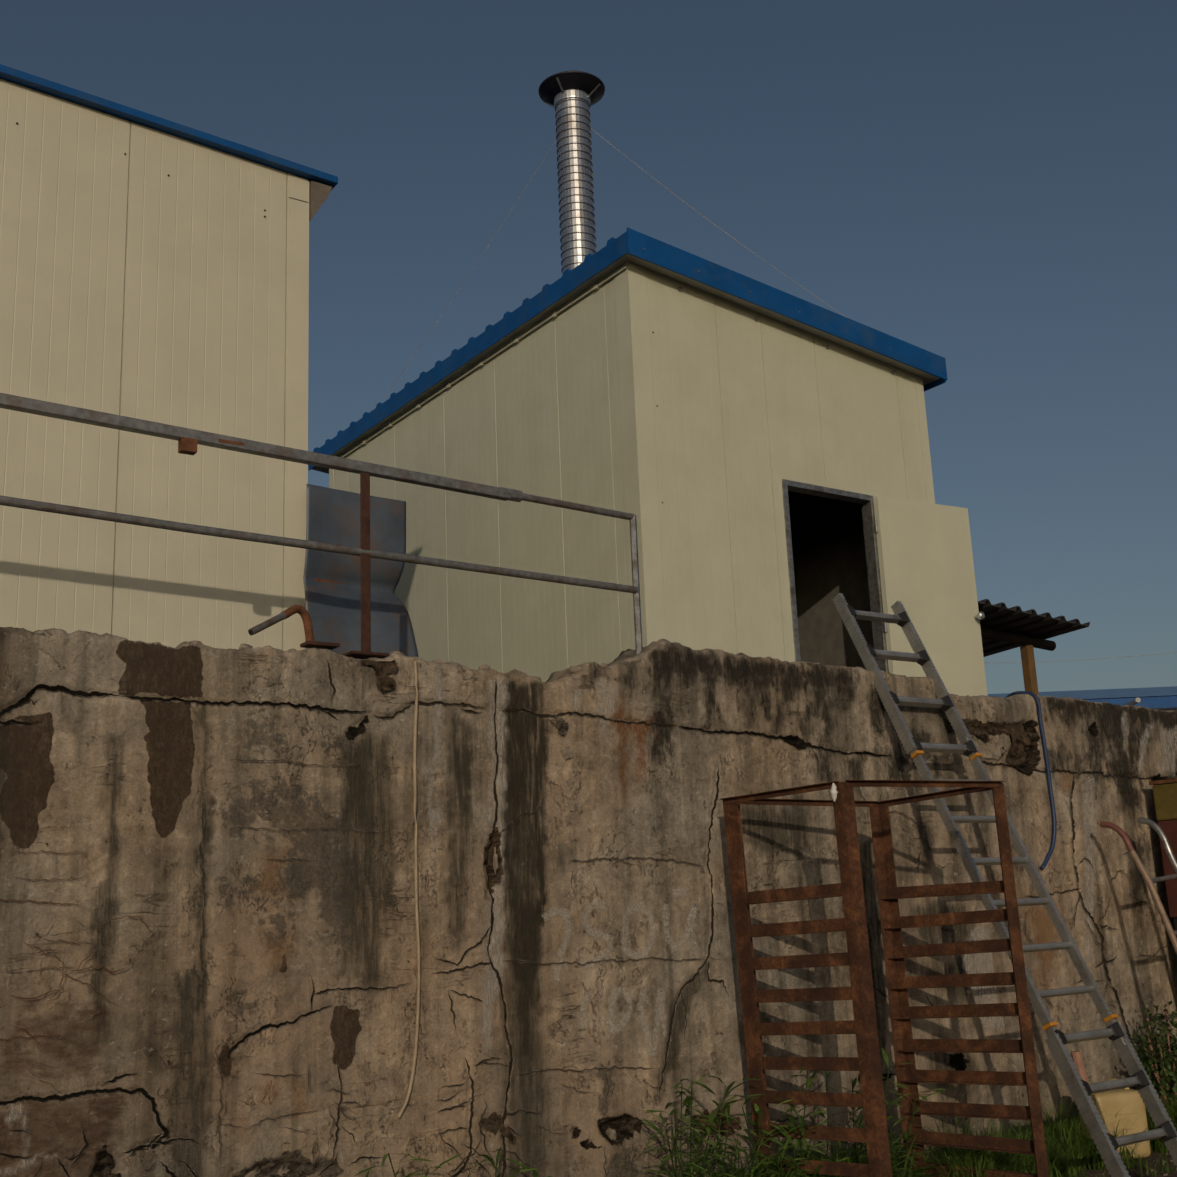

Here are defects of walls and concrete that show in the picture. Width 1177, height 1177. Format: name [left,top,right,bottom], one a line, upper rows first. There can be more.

leakage [0,712,55,848]
leakage [116,640,206,838]
spalling [944,717,1041,775]
leakage [218,725,392,985]
crack [0,657,950,1177]
spalling [483,827,504,893]
leakage [483,680,547,1177]
crack [982,753,1175,1039]
leakage [330,1005,361,1070]
spalling [90,1144,121,1177]
spalling [237,1149,344,1177]
spalling [572,1113,643,1150]